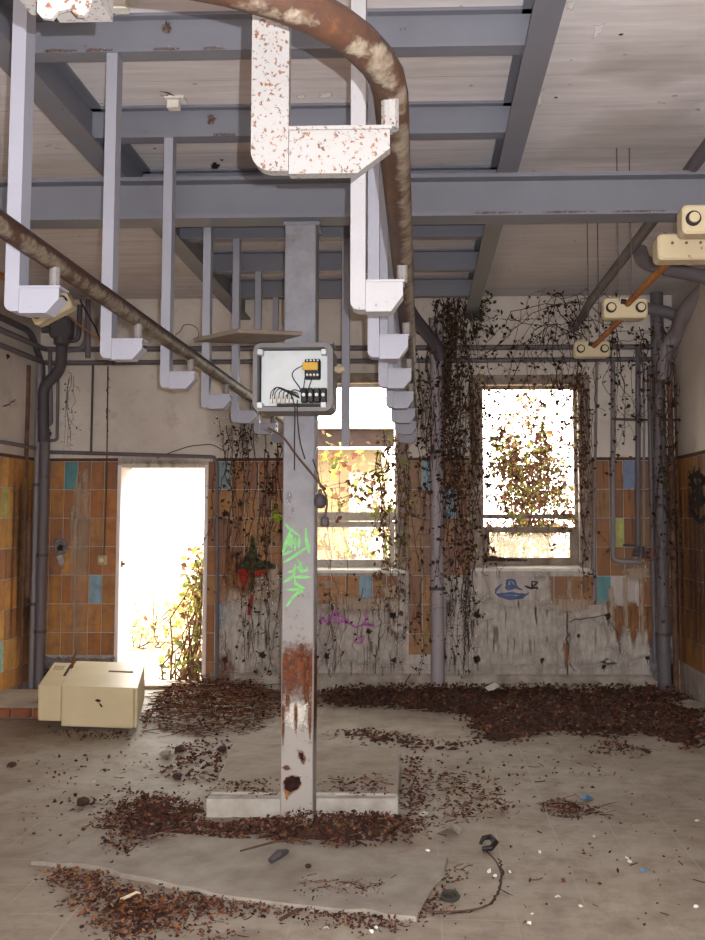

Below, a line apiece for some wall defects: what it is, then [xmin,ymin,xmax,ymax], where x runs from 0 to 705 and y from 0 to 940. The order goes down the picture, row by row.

peeling [474,575,658,681]
rust [282,644,317,744]
rust [282,765,301,799]